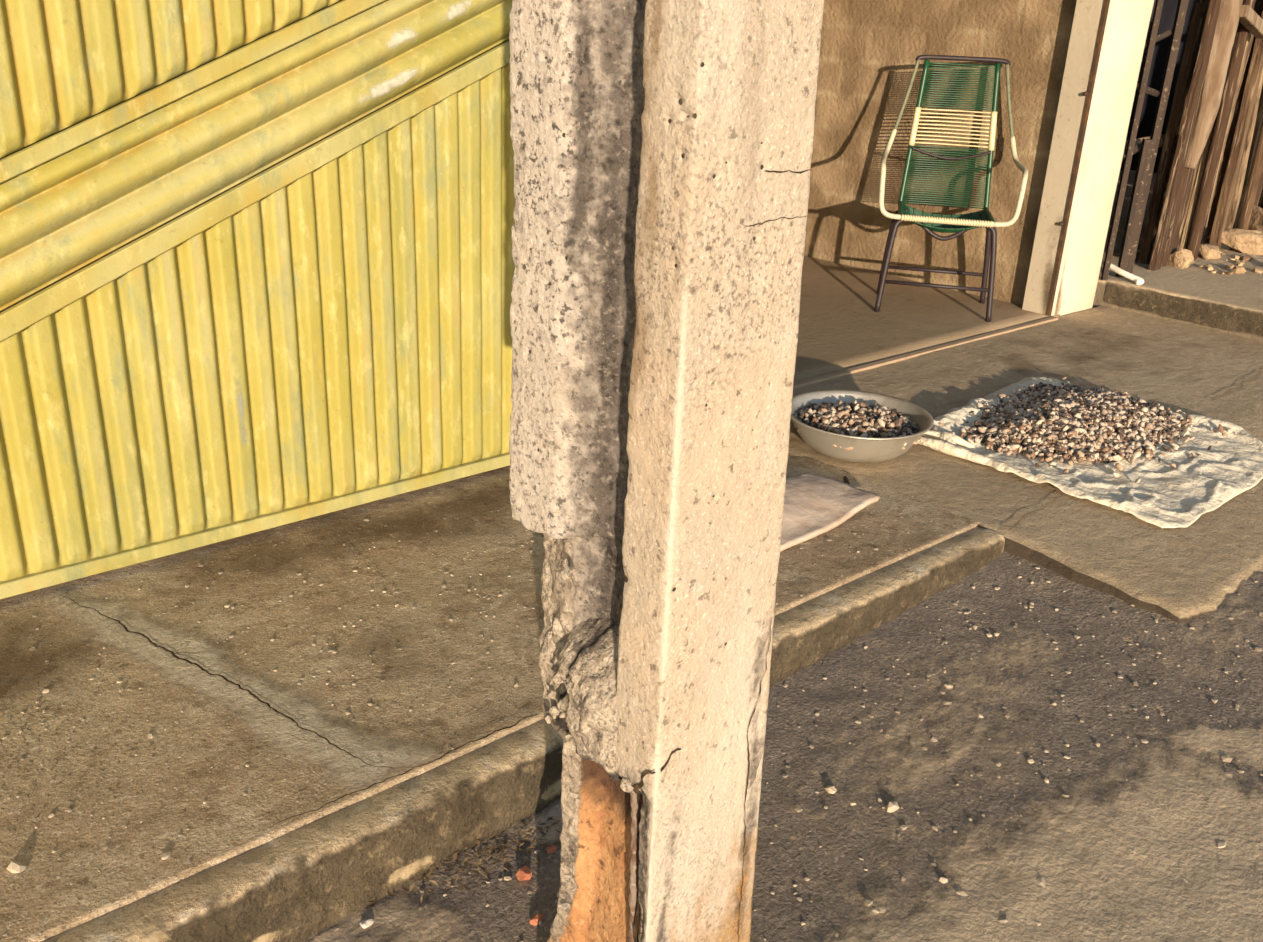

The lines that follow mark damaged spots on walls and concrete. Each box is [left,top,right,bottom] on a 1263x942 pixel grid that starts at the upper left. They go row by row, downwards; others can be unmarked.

water stain [567,0,647,623]
crack [60,595,538,832]
spalling [513,519,582,942]
rust [547,756,643,942]
spalling [620,777,650,942]